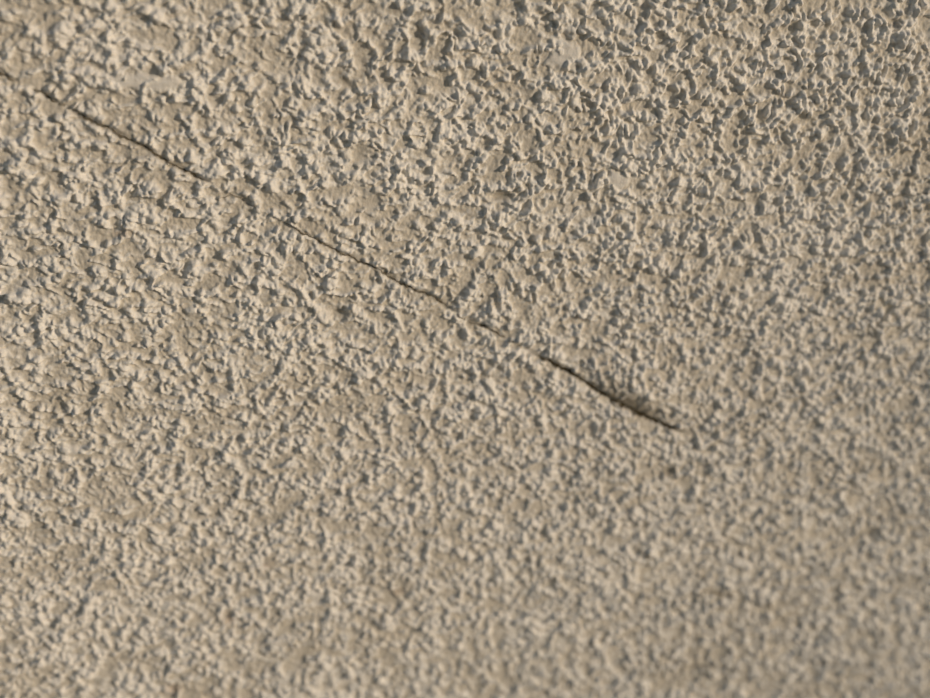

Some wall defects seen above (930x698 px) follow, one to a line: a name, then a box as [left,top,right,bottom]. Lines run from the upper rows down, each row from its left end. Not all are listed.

crack [34,89,202,179]
crack [297,230,682,432]